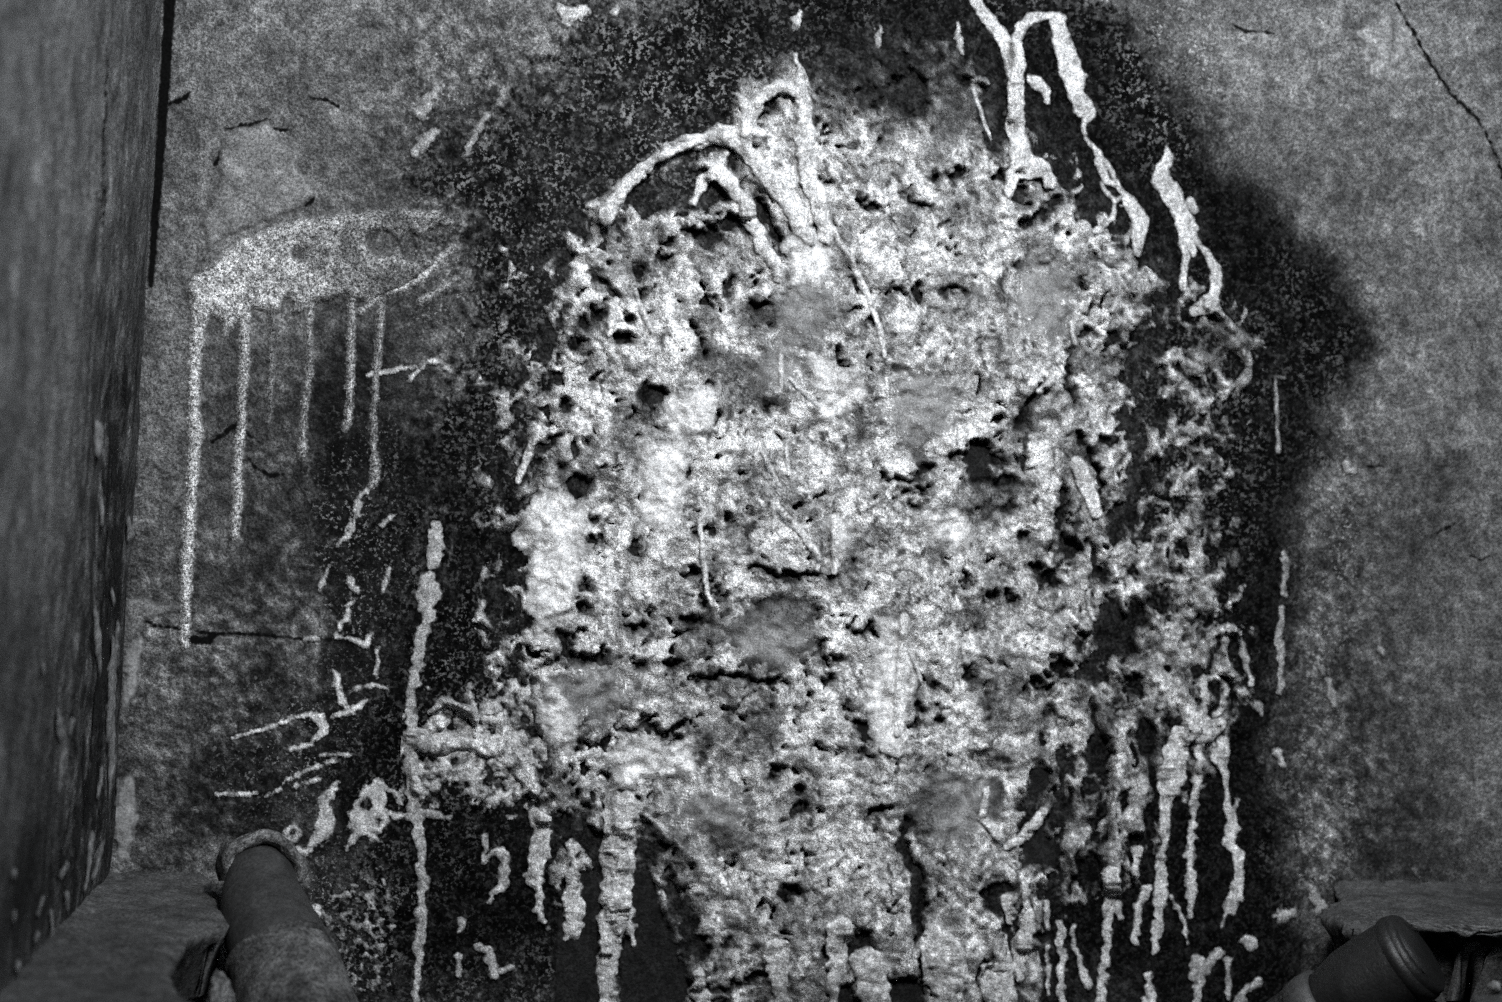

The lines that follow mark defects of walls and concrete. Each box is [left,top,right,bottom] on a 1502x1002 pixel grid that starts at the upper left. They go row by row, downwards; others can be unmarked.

crack [1395,2,1502,179]
damp [790,802,807,818]
damp [1015,792,1043,835]
damp [1117,787,1133,815]
damp [329,873,376,910]
damp [777,884,801,904]
damp [895,809,926,944]
damp [649,873,713,969]
damp [979,881,1022,964]
damp [847,930,871,958]
damp [614,956,622,986]
damp [705,971,769,995]